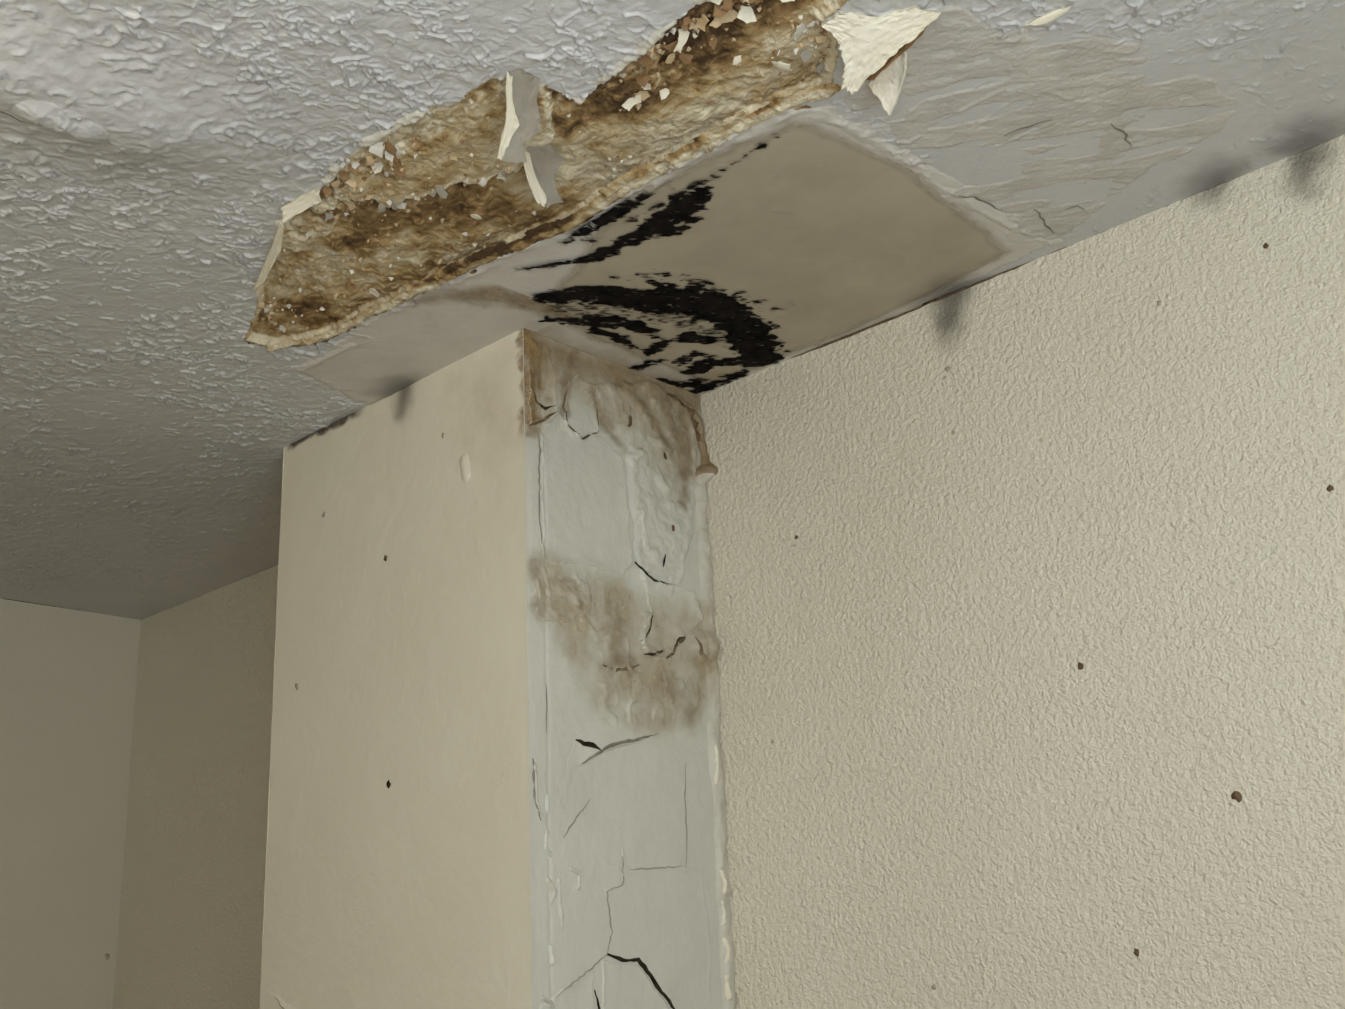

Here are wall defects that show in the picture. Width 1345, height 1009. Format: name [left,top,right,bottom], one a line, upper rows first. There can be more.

peeling [622,0,763,111]
peeling [772,21,827,73]
peeling [253,140,448,333]
peeling [463,69,564,208]
damp [517,134,779,271]
damp [456,272,791,445]
crack [537,430,546,558]
peeling [525,342,705,726]
peeling [668,394,718,476]
peeling [532,758,553,858]
crack [556,764,688,1009]
peeling [540,848,732,1009]